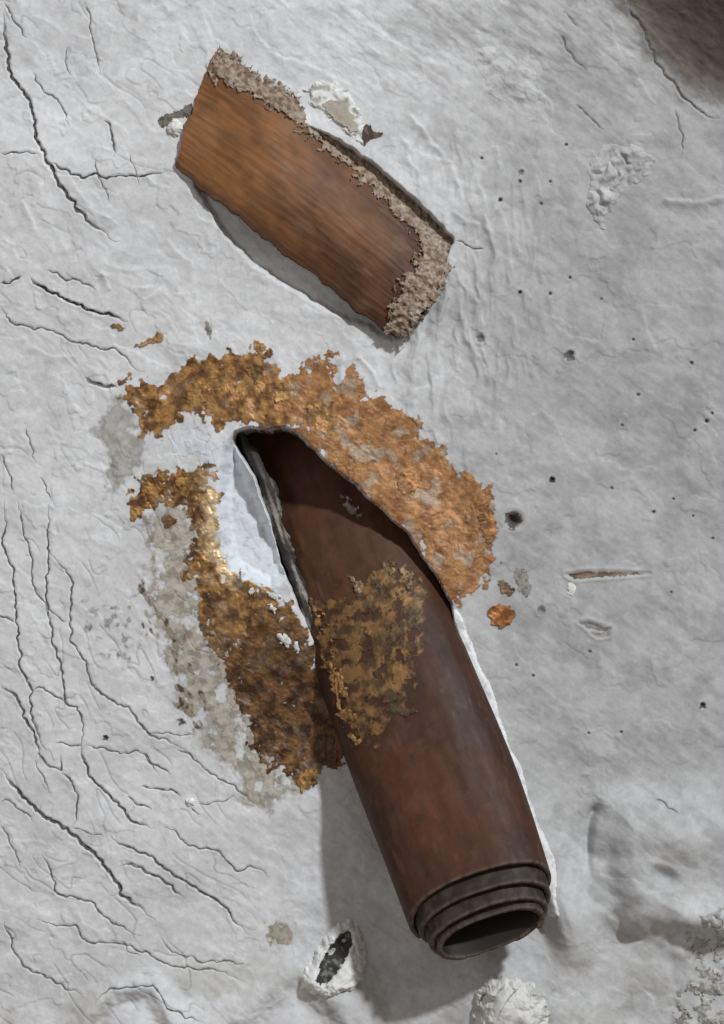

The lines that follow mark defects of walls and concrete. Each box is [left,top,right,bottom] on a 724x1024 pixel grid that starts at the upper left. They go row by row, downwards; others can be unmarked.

crack [1,3,167,242]
spalling [158,103,193,137]
spalling [302,80,383,146]
damp [617,0,724,100]
crack [0,269,128,321]
crack [3,311,145,388]
damp [94,394,145,490]
crack [0,429,271,1022]
rust [138,580,207,729]
damp [143,506,302,811]
peeling [308,597,363,746]
spalling [451,609,560,918]